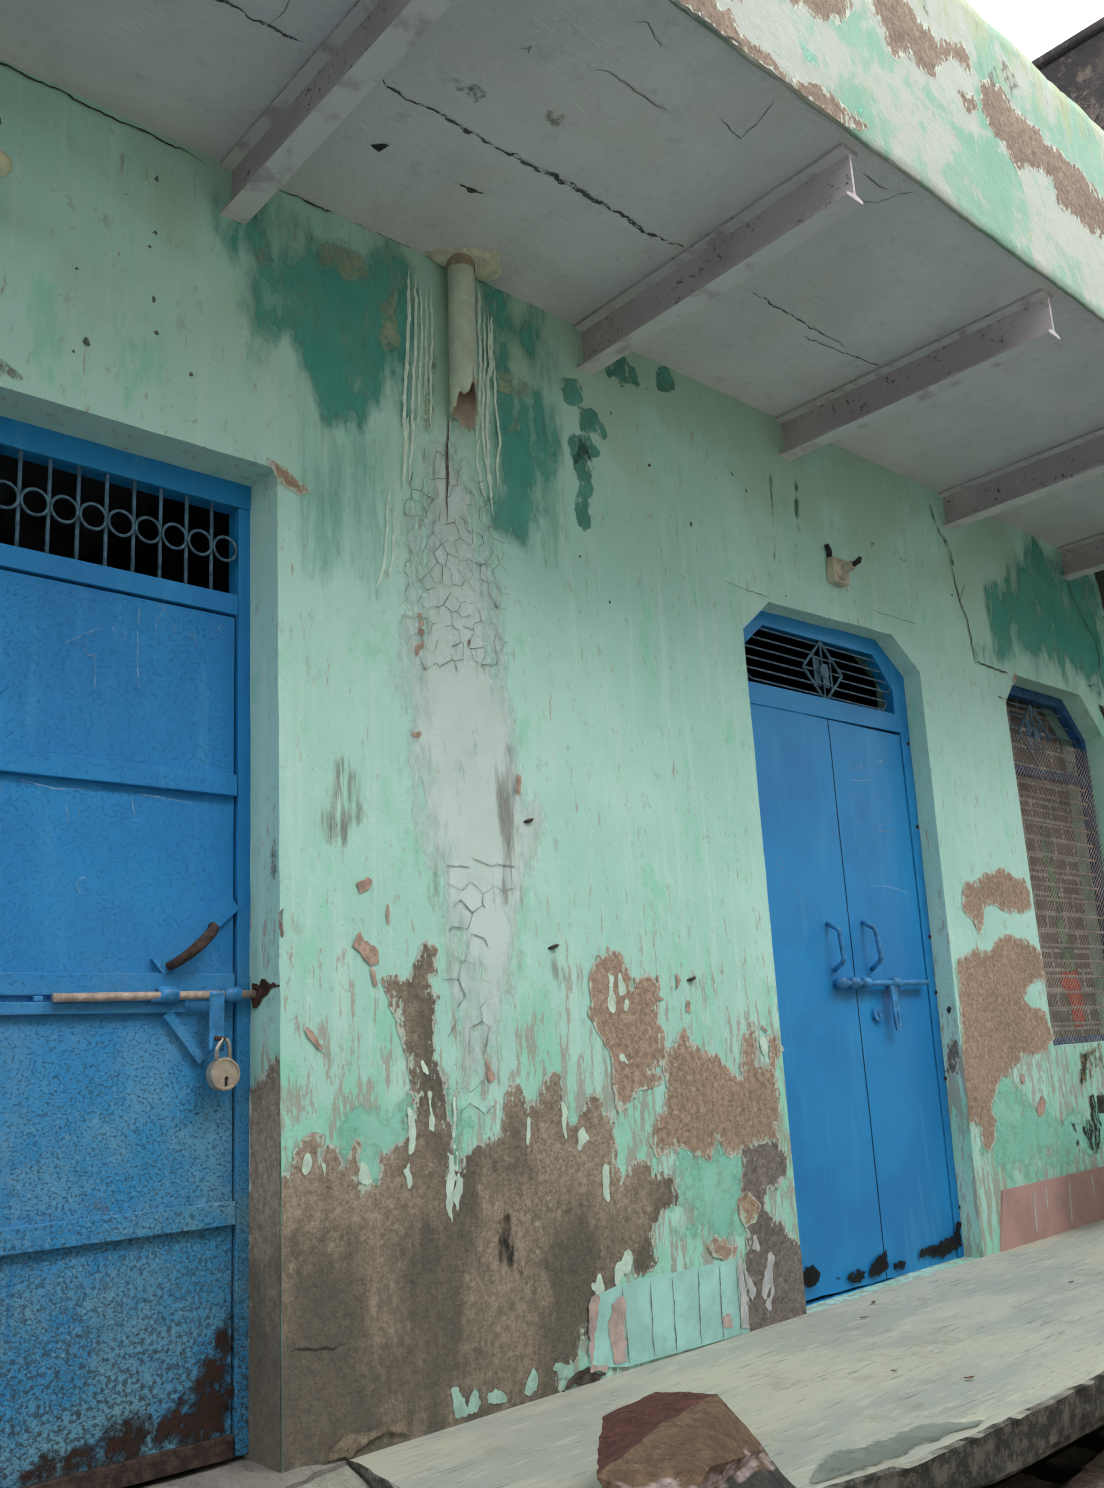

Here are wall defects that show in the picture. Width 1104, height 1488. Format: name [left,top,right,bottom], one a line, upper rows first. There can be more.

crack [215,0,302,42]
crack [382,79,683,247]
peeling [679,0,869,131]
peeling [788,0,1104,242]
spalling [267,457,311,495]
crack [398,420,512,674]
crack [952,569,1009,679]
peeling [356,877,372,893]
rust [251,979,280,1009]
peeling [945,867,1056,1152]
peeling [247,932,962,1473]
rust [19,1316,234,1486]